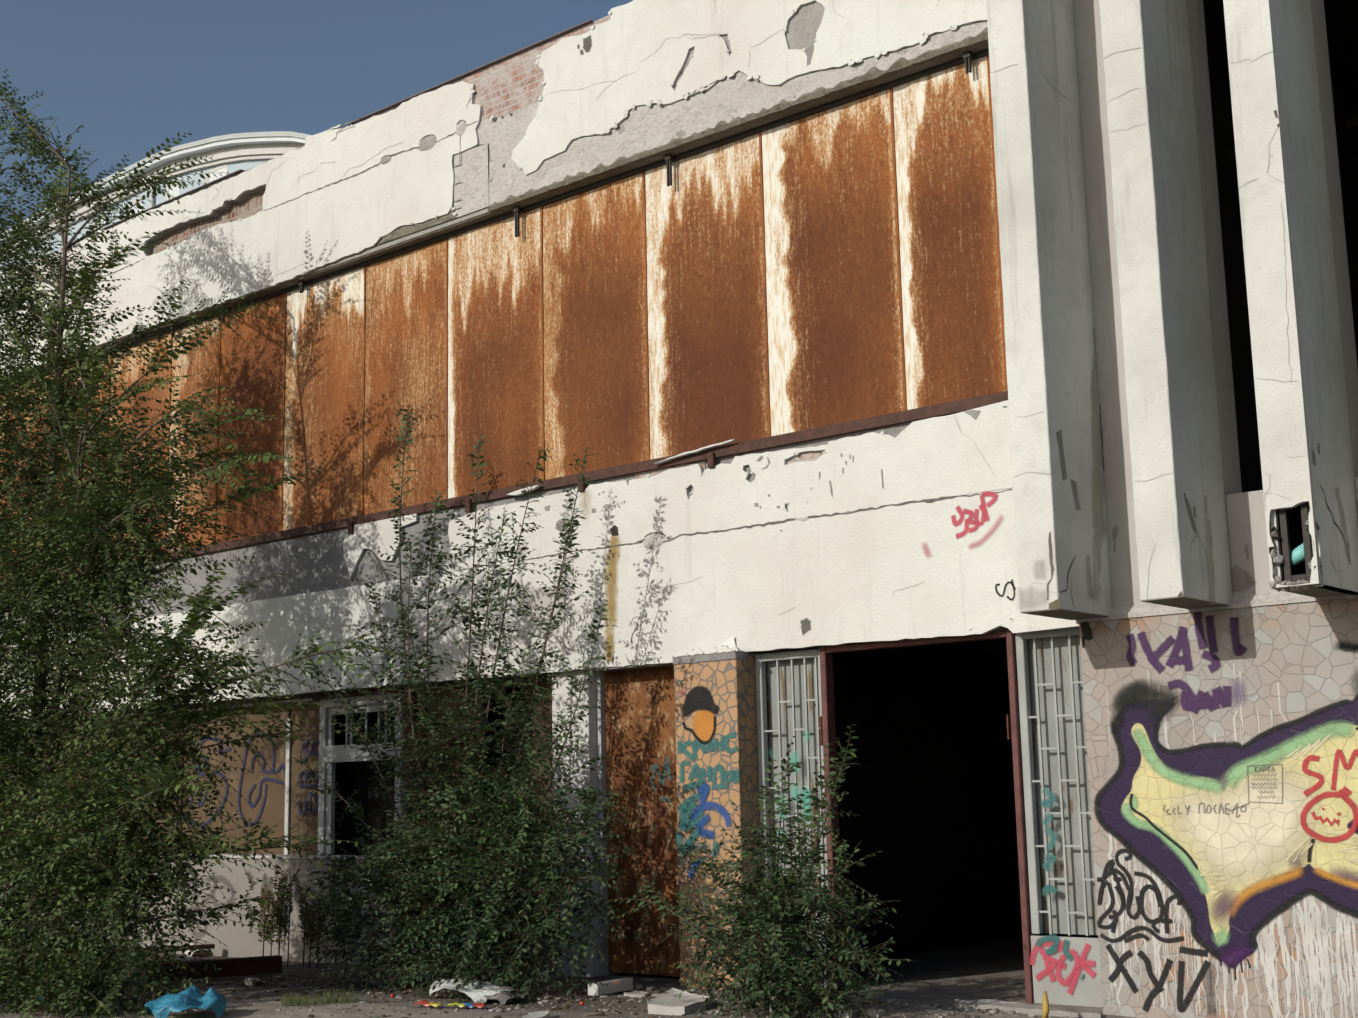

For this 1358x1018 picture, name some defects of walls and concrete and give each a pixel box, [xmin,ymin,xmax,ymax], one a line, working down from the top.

crack [264,84,477,211]
spalling [465,1,989,215]
corrosion [0,56,1005,582]
flaking render [50,507,457,622]
flaking render [474,485,578,532]
corrosion [605,538,619,661]
crack [525,416,1049,560]
spalling [1269,501,1323,592]